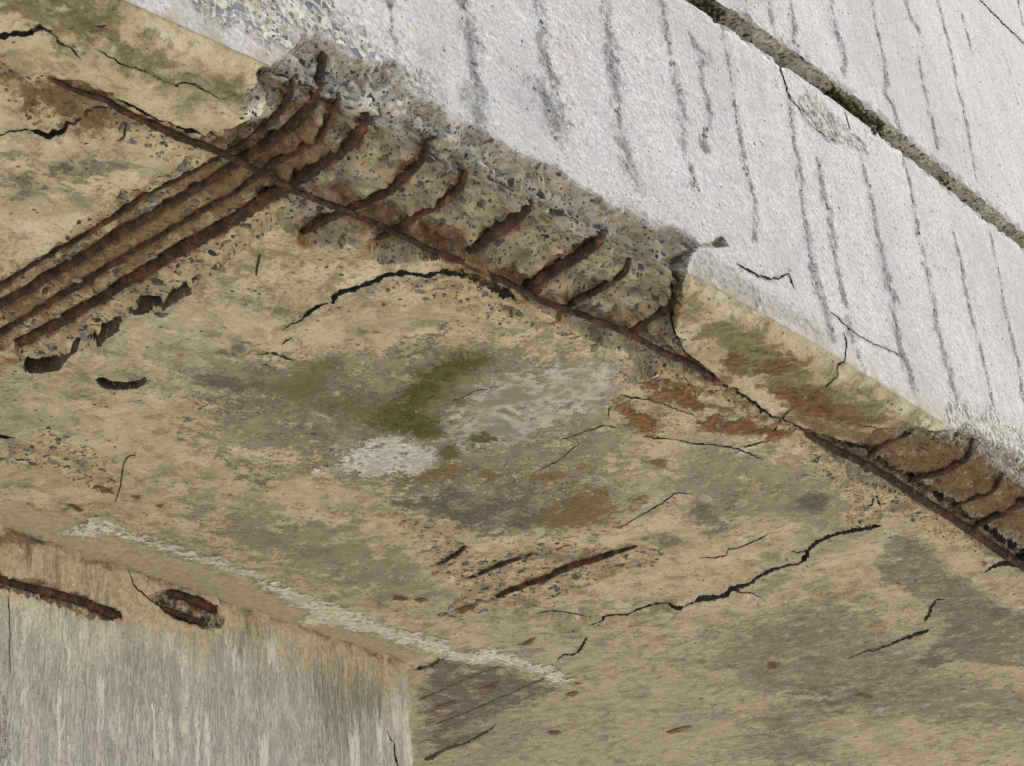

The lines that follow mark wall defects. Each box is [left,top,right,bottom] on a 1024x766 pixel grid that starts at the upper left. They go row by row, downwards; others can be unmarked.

rust [0,67,123,139]
crack [0,24,236,100]
rust [0,100,554,326]
spalling [0,33,769,423]
crack [259,268,517,367]
water stain [164,304,729,543]
crack [738,264,794,288]
water stain [662,283,929,442]
rust [609,347,1024,548]
spalling [794,413,1024,578]
spalling [150,588,225,631]
crack [416,492,881,761]